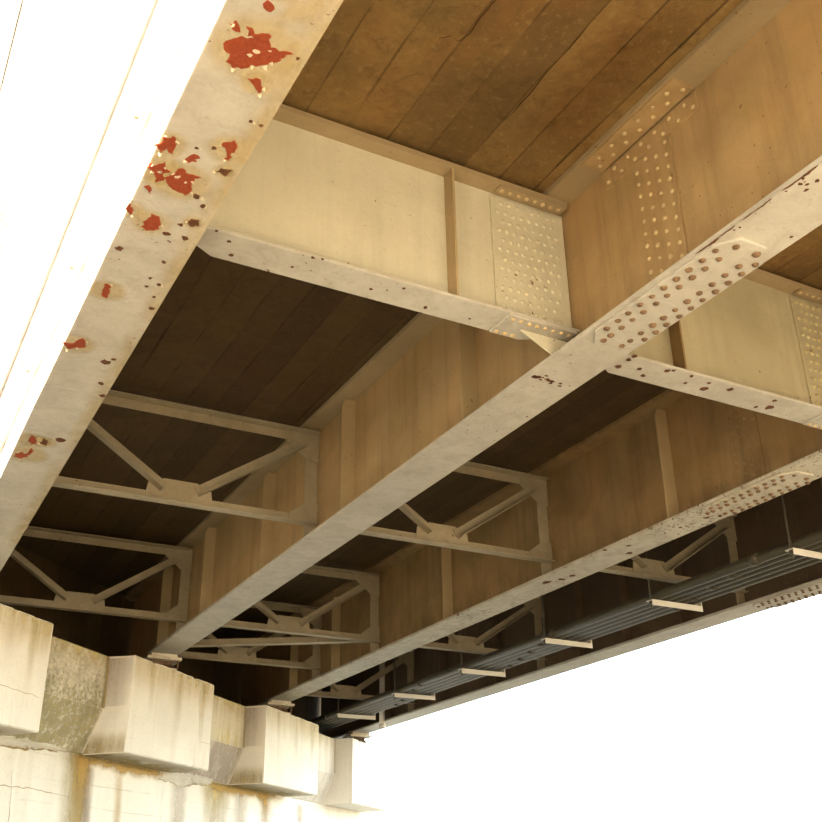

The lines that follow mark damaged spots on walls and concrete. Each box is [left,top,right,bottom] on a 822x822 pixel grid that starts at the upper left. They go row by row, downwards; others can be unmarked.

crack [442,0,496,41]
peeling [223,20,293,98]
peeling [144,136,201,197]
peeling [213,140,238,176]
corrosion [782,165,820,192]
peeling [141,214,163,231]
corrosion [696,198,772,254]
peeling [61,338,88,352]
peeling [14,435,48,461]
leakage [0,657,295,822]